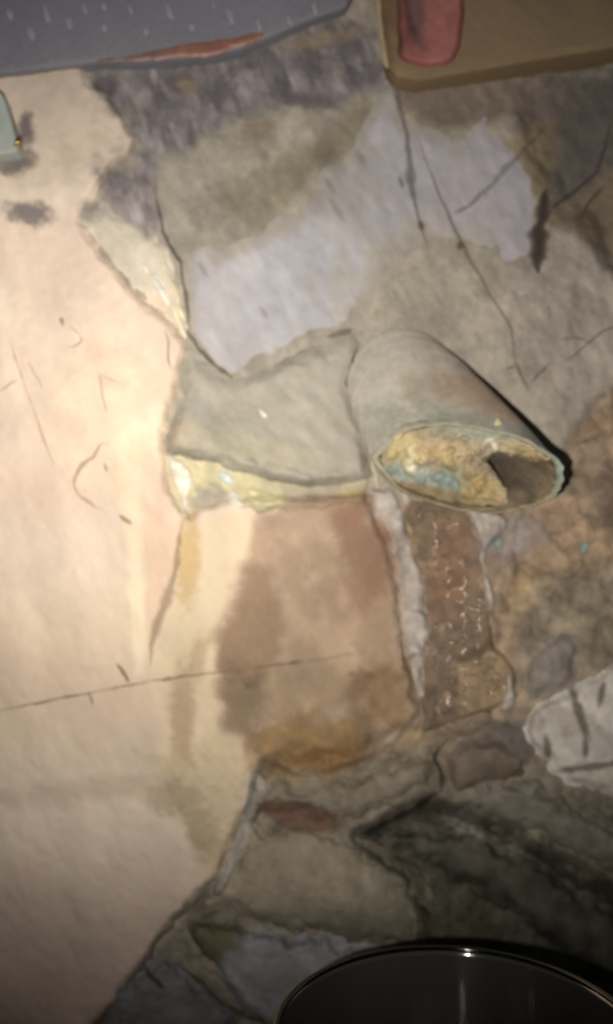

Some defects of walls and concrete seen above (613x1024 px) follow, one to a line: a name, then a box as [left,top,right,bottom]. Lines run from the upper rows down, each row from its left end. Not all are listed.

peeling [79,200,189,338]
spalling [530,190,548,273]
leakage [219,499,400,767]